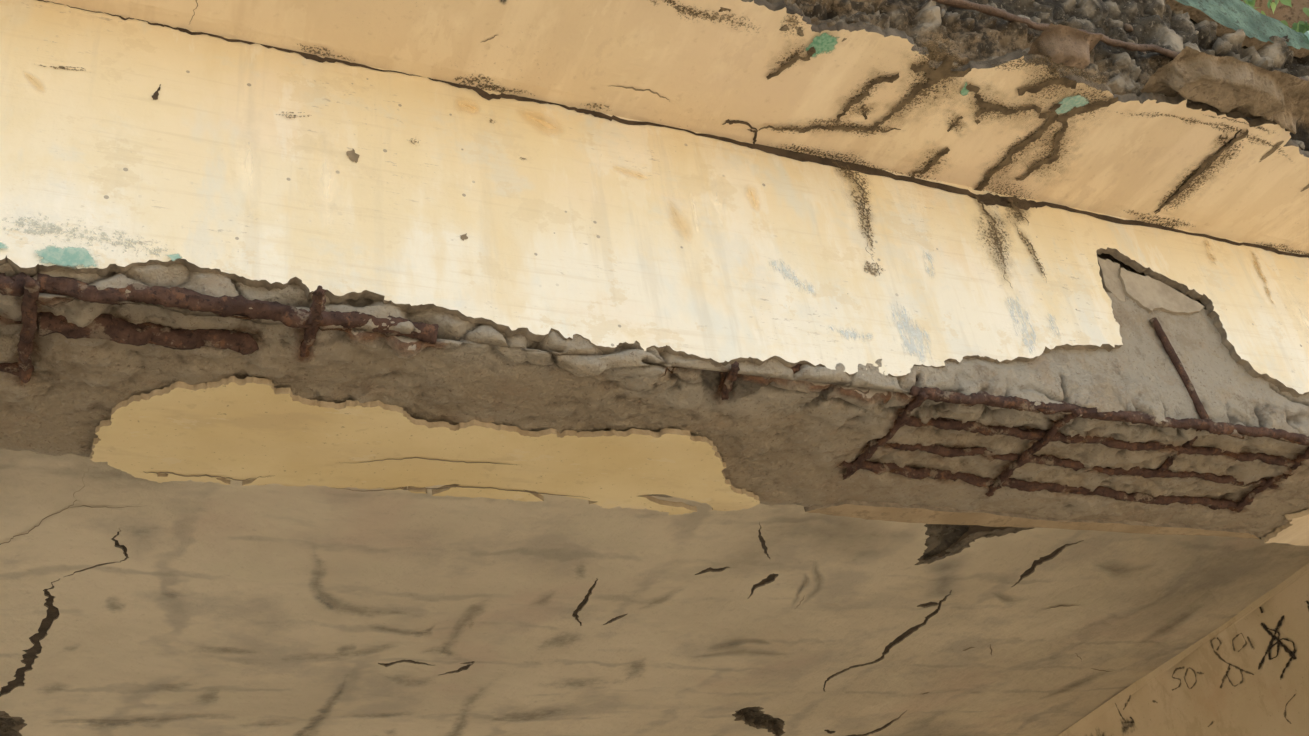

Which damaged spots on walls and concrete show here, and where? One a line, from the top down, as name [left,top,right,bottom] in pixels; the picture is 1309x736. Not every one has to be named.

leakage [650,0,754,29]
leakage [455,74,532,95]
crack [38,0,1309,258]
leakage [759,32,1282,286]
spalling [766,0,1309,151]
spalling [0,217,1309,563]
rust [1219,437,1304,512]
crack [0,585,59,695]
crack [823,595,947,689]
spalling [0,711,26,736]
spalling [735,707,784,736]
crack [826,716,900,736]